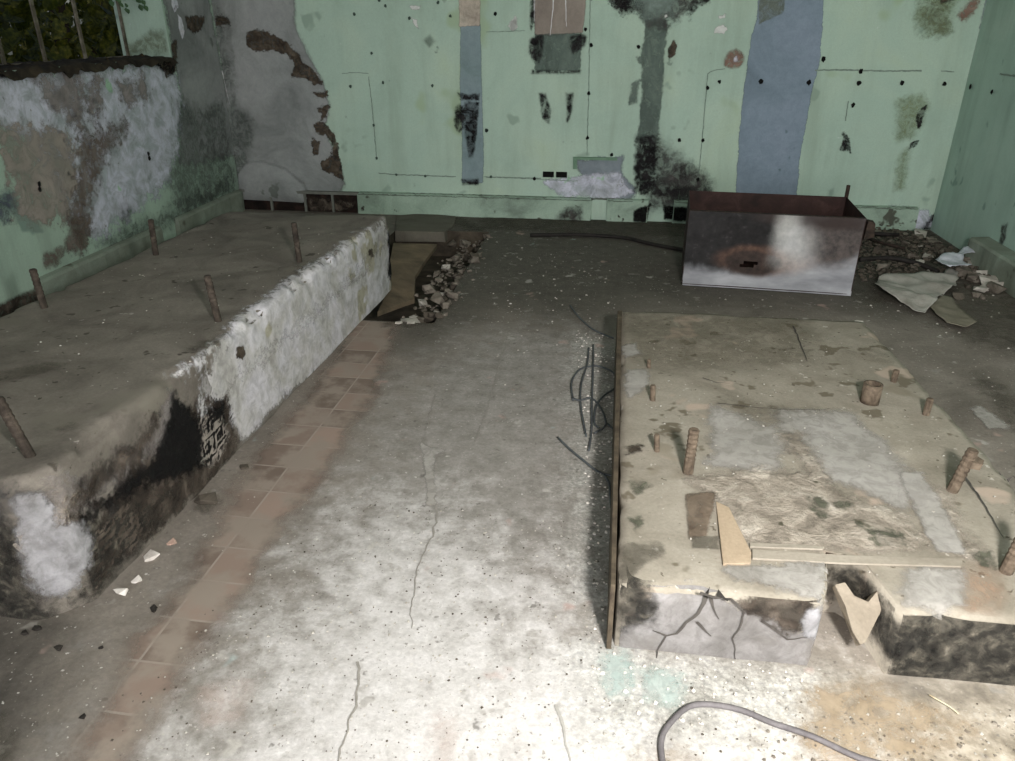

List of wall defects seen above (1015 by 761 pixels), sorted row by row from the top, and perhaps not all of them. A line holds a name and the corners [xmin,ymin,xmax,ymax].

peeling [0,0,231,256]
spalling [246,28,344,180]
water stain [611,0,710,201]
water stain [12,493,93,596]
crack [410,505,438,629]
crack [653,587,807,659]
crack [338,661,361,761]